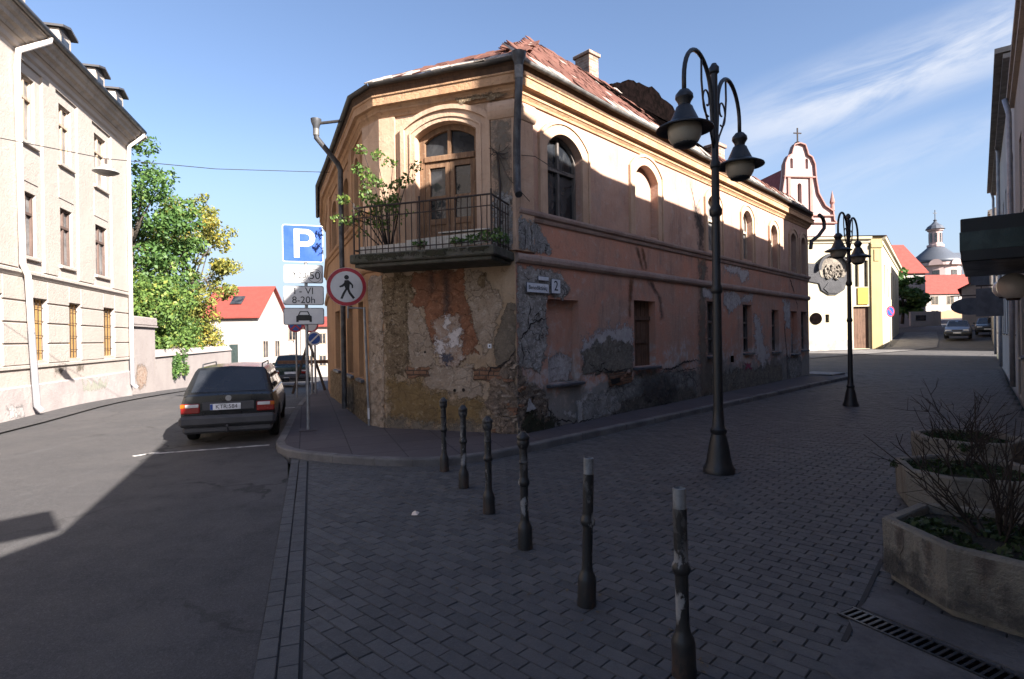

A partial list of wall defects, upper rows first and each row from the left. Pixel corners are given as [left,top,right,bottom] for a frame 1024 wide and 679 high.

peeling [330,190,571,434]
crack [486,303,548,379]
flaking render [581,335,634,388]